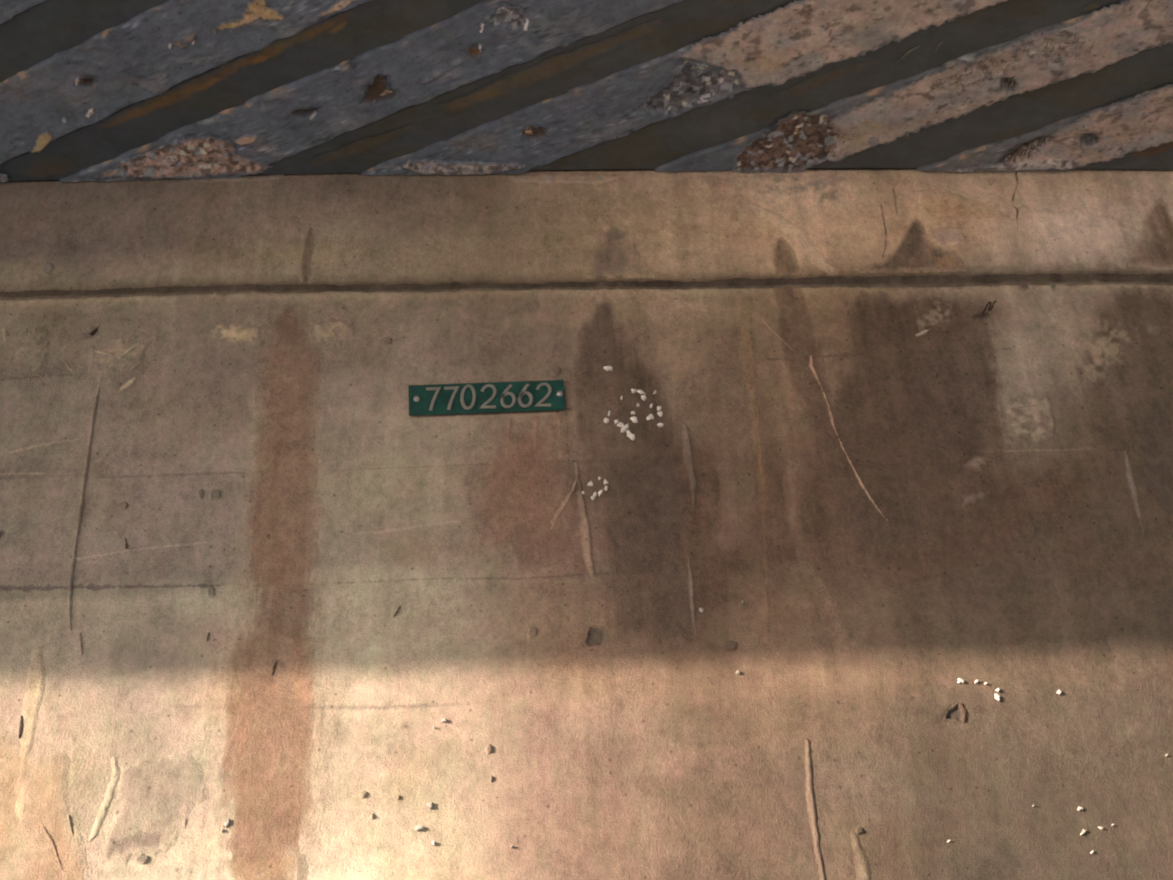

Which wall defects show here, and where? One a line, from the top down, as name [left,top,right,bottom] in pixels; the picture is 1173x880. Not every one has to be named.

peeling [212,0,286,34]
spalling [92,134,273,180]
peeling [631,0,1173,206]
leakage [549,196,1173,659]
corrosion [188,303,341,880]
corrosion [0,728,92,880]
leakage [614,732,825,880]
leakage [849,830,872,880]
leakage [892,686,1173,880]